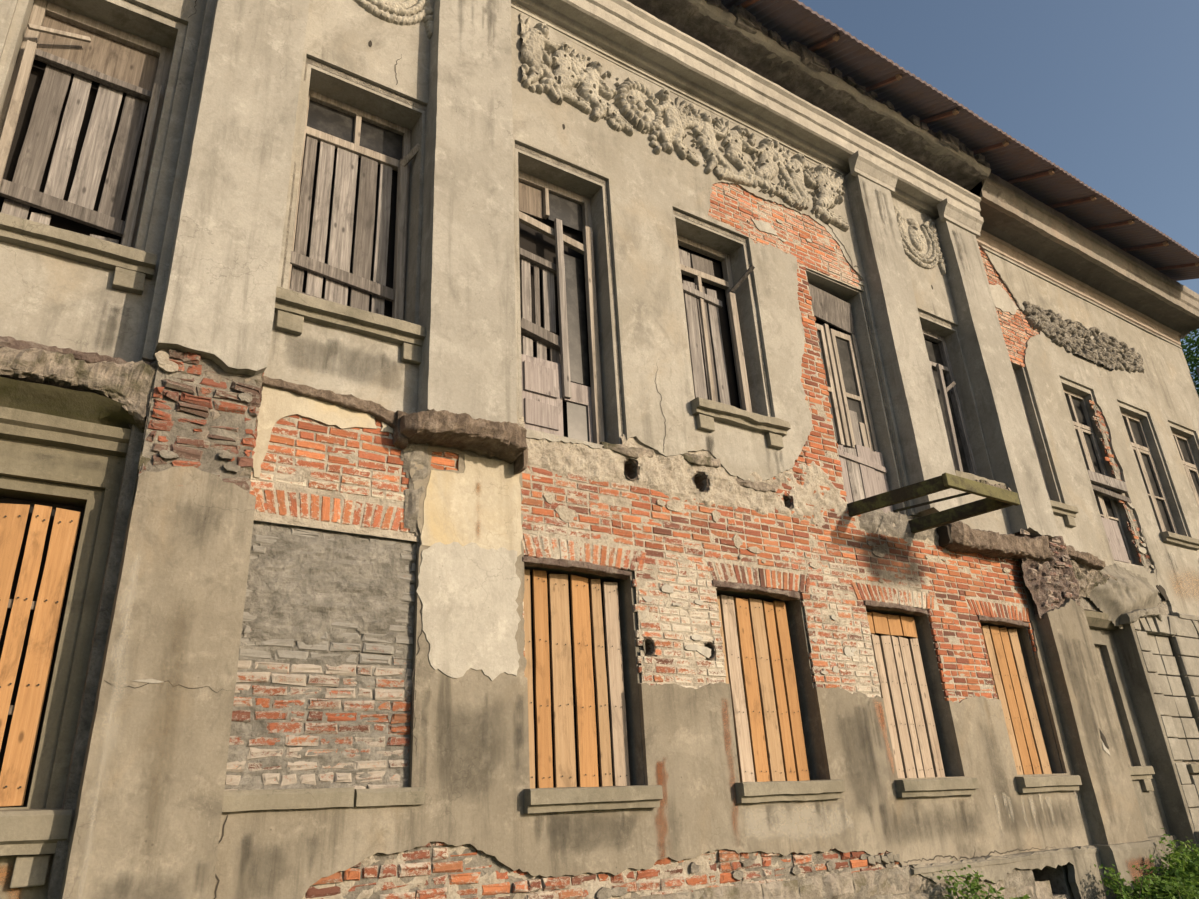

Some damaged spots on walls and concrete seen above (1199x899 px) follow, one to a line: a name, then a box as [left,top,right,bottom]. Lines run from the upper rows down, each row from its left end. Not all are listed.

flaking render [131,349,419,542]
flaking render [519,182,1118,703]
crack [104,679,227,693]
flaking render [303,842,900,899]